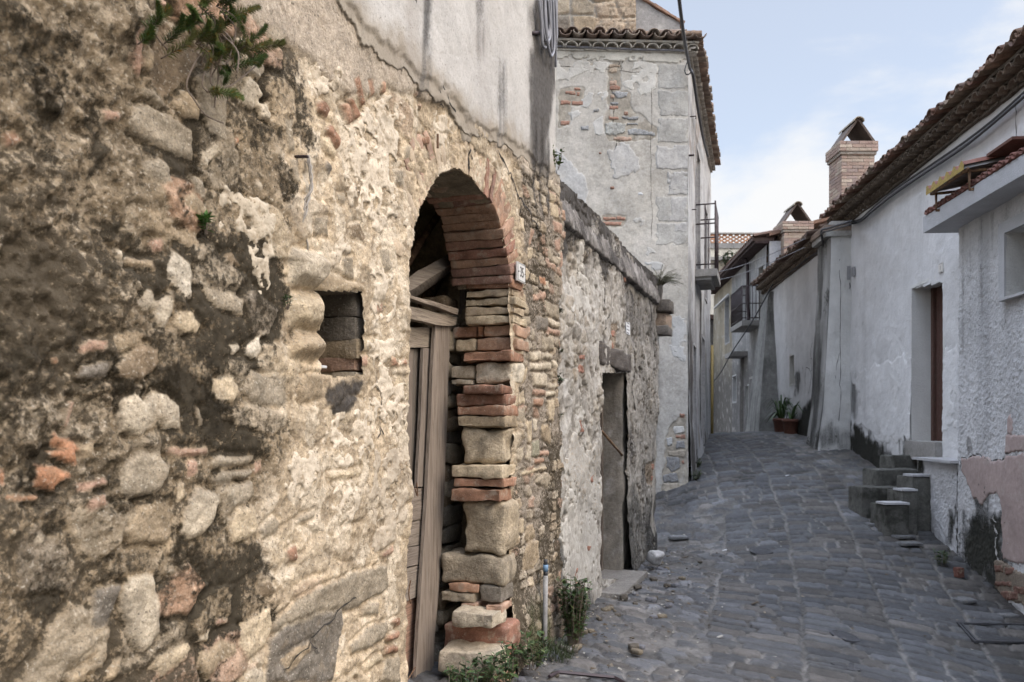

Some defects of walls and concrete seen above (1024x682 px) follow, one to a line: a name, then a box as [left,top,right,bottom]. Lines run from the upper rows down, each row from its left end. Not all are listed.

peeling [310,62,344,96]
flaking render [336,0,658,183]
peeling [343,94,409,233]
leakage [795,247,909,468]
spalling [645,413,688,491]
leakage [942,484,1008,594]
flaking render [961,414,1024,605]